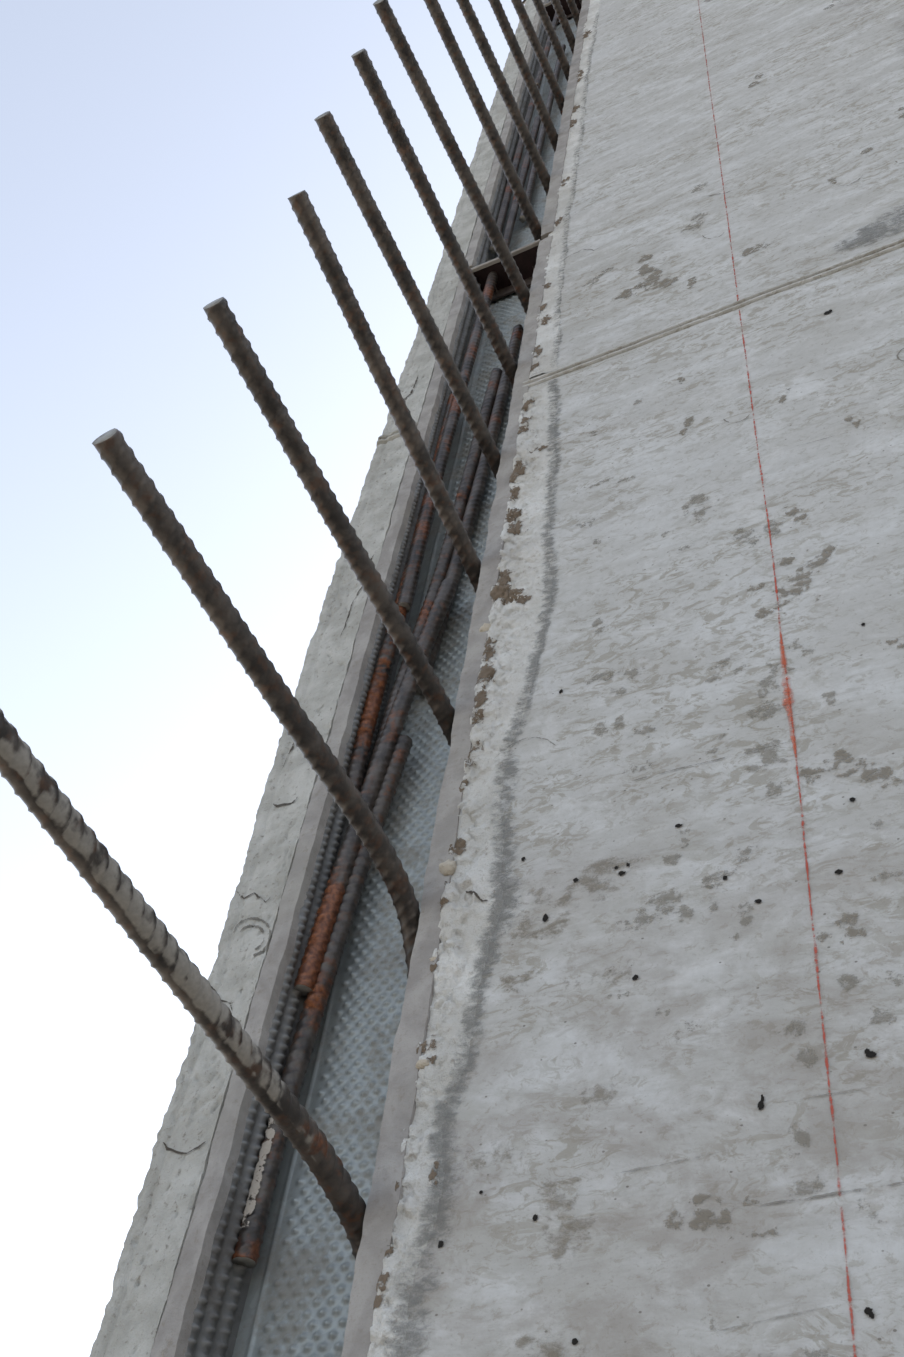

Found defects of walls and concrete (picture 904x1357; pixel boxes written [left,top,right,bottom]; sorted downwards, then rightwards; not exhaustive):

spalling [0,0,601,1357]
leakage [418,379,561,1261]